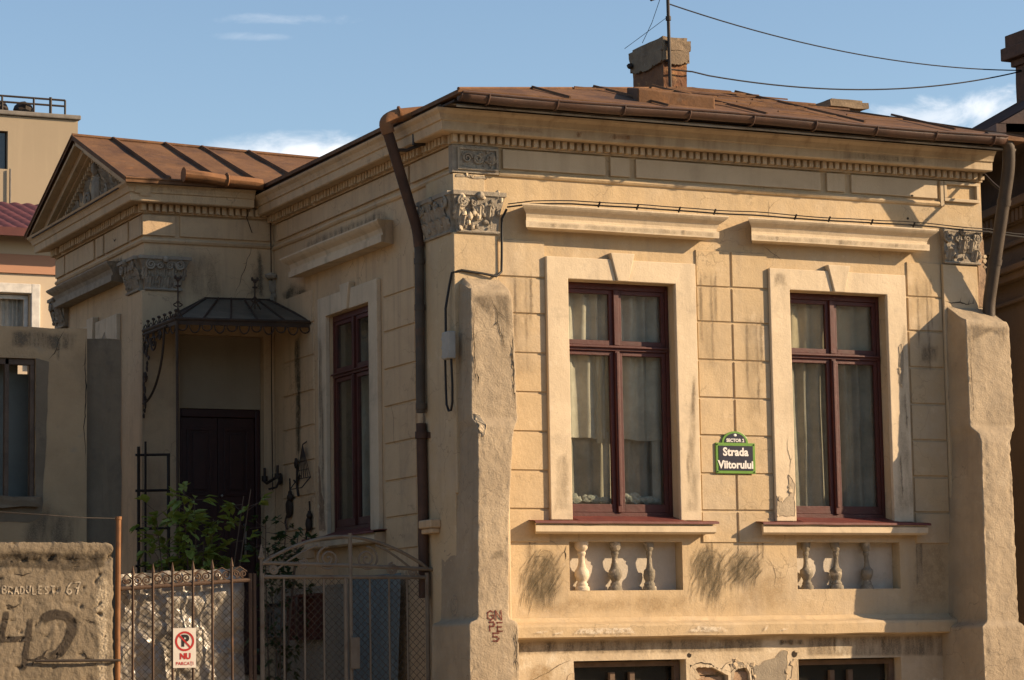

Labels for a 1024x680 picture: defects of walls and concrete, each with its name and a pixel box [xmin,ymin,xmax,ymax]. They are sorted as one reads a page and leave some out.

peeling [776,474,796,517]
leakage [519,550,564,611]
leakage [690,547,761,608]
peeling [687,650,799,680]